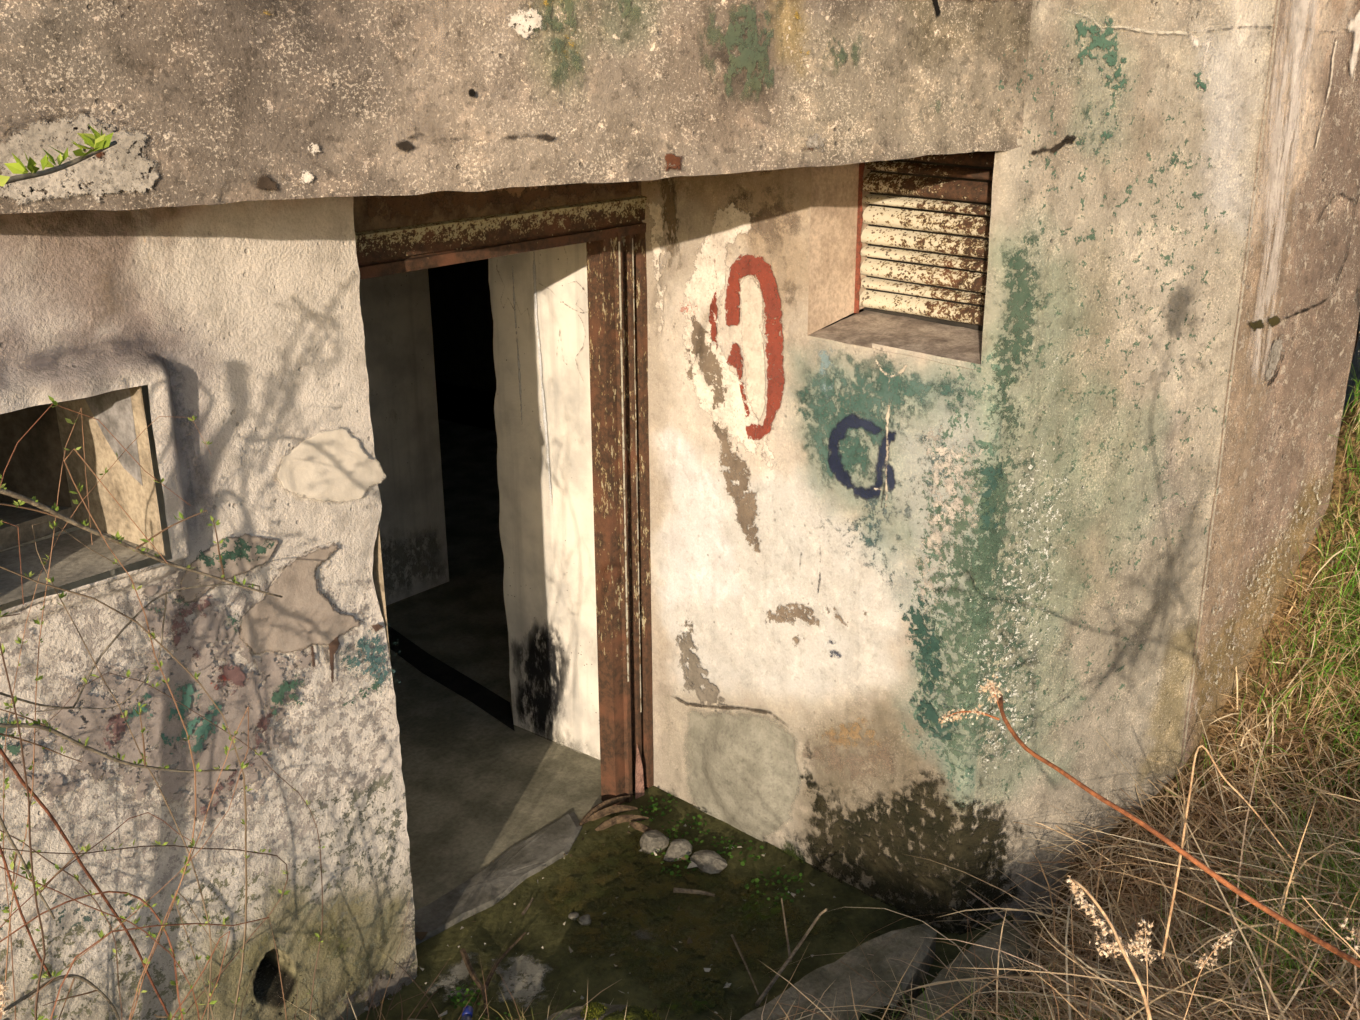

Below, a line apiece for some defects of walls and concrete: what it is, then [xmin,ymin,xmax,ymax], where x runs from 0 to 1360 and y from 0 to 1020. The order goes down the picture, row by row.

crack [932,0,940,16]
crack [1306,11,1360,148]
spalling [0,110,160,206]
crack [396,128,456,151]
corrosion [366,181,639,224]
crack [505,134,555,142]
crack [1032,135,1077,155]
peeling [647,200,666,332]
peeling [682,203,776,553]
peeling [276,428,386,503]
peeling [0,533,395,833]
damp [796,747,1023,936]